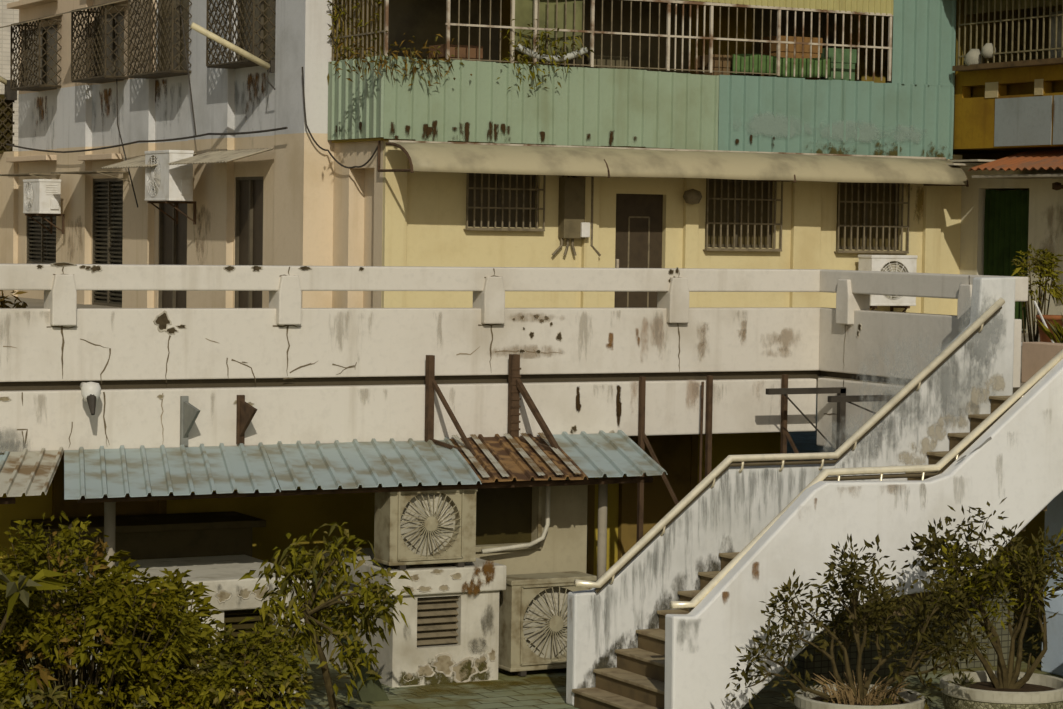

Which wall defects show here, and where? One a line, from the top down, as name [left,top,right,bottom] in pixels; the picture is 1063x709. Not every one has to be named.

rust [99,88,111,116]
rust [247,73,265,106]
rust [422,120,438,141]
rust [452,122,470,143]
rust [487,121,510,140]
spalling [153,310,186,335]
crack [206,338,256,383]
crack [273,325,357,380]
crack [47,326,111,445]
crack [161,335,171,445]
peeling [401,569,462,594]
spalling [403,648,496,683]